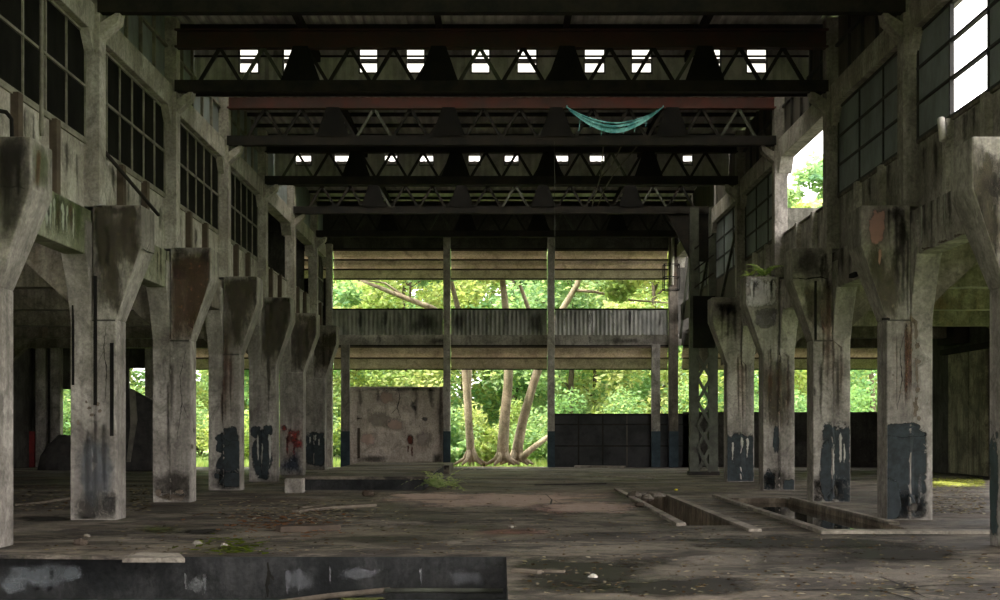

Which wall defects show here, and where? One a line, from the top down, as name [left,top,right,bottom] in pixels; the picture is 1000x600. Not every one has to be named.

leakage [0,110,34,231]
leakage [45,198,81,239]
leakage [870,208,908,316]
corrosion [896,316,912,398]
spalling [0,557,508,600]